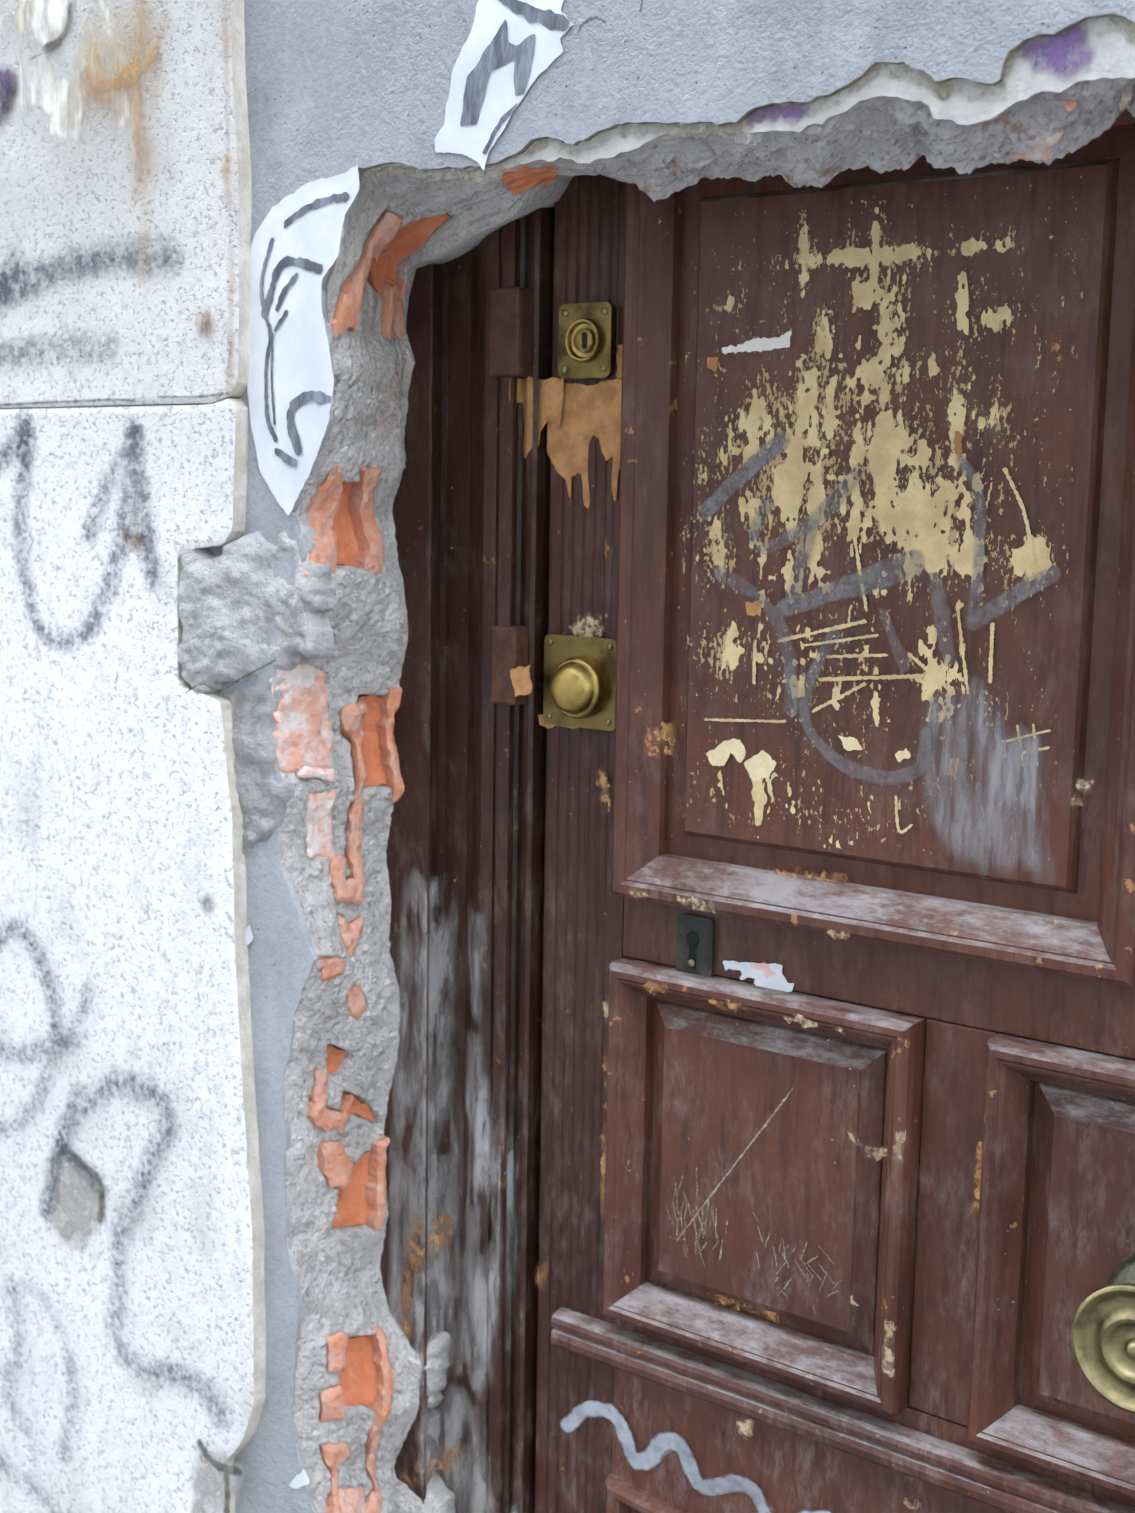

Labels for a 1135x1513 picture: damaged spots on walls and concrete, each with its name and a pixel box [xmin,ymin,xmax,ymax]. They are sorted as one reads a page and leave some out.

spalling [193,1439,241,1513]
spalling [226,16,1135,1513]